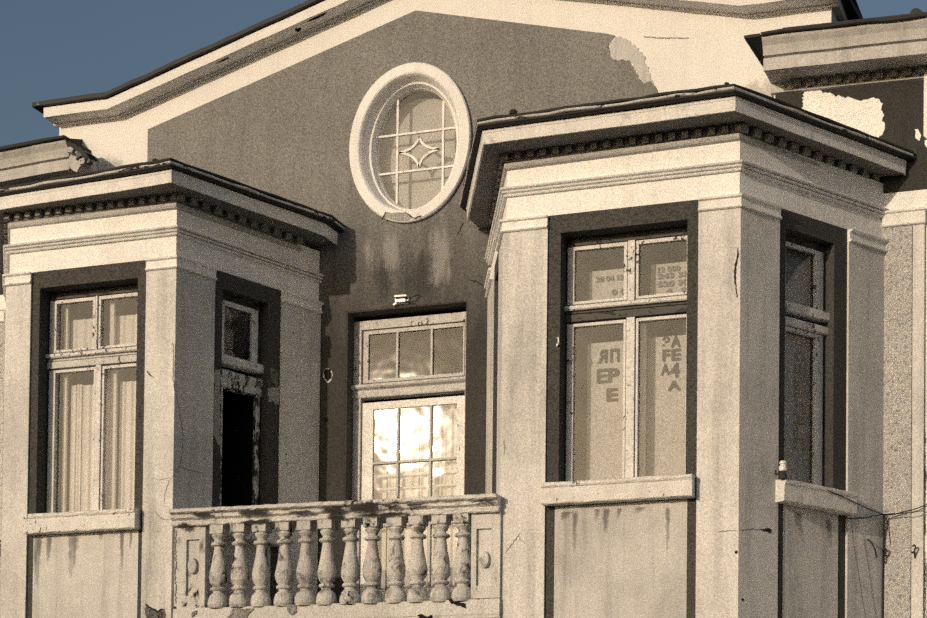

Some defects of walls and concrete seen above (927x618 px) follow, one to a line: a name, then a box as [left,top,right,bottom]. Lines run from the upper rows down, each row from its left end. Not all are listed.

peeling [609,36,658,97]
peeling [802,90,885,138]
crack [732,247,740,297]
peeling [213,369,221,447]
crack [152,342,201,603]
spalling [144,604,166,618]